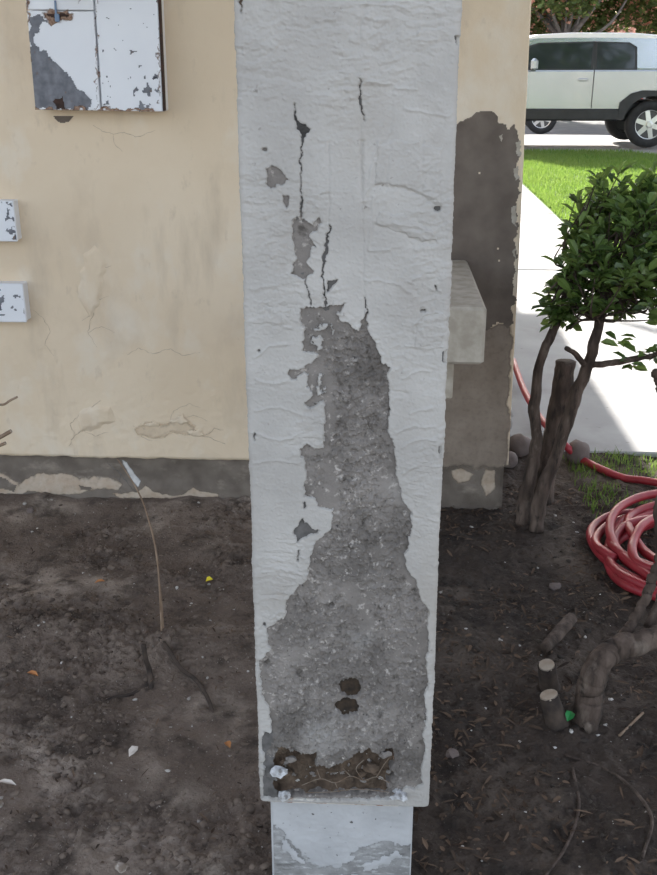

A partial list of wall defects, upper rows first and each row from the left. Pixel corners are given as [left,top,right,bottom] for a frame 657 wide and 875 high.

peeling [266,166,288,188]
crack [294,104,310,223]
peeling [291,211,322,282]
crack [301,225,338,311]
peeling [451,111,522,331]
peeling [0,460,218,499]
spalling [259,304,429,799]